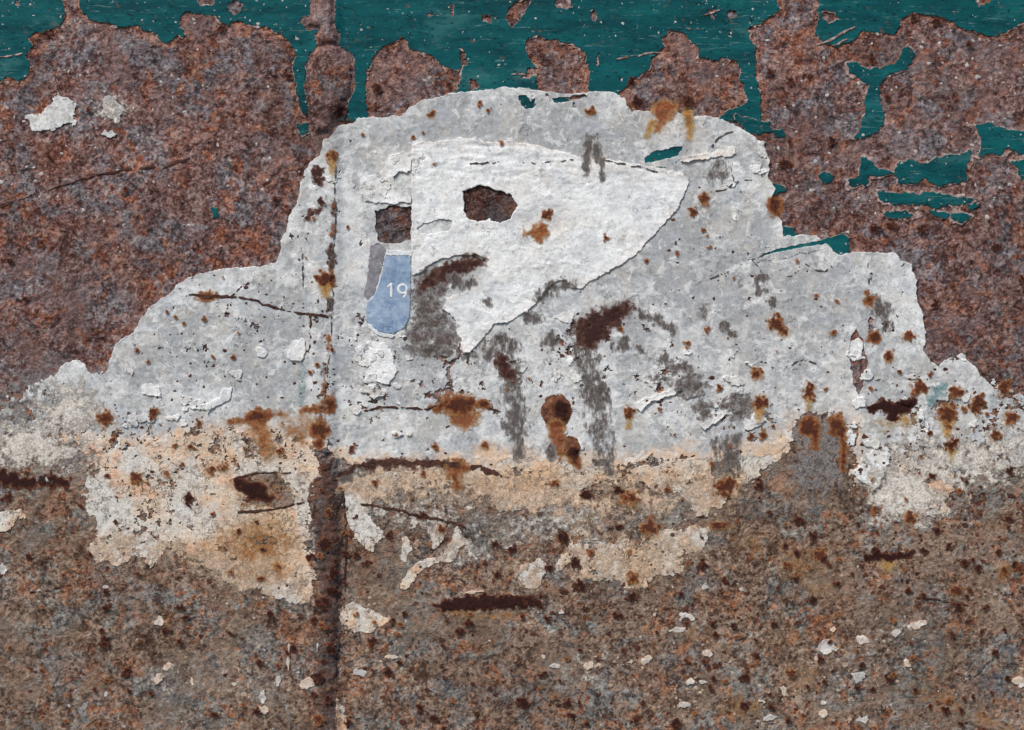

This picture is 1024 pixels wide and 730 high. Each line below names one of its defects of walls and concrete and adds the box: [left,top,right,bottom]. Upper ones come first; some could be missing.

peeling [0,0,66,84]
peeling [78,0,319,137]
peeling [813,0,1024,48]
corrosion [0,0,463,394]
peeling [818,121,1024,235]
crack [188,146,337,411]
corrosion [539,394,586,470]
leakage [523,276,678,476]
leakage [648,350,754,474]
leakage [718,320,738,338]
corrosion [619,0,1024,611]
corrosion [206,334,471,730]